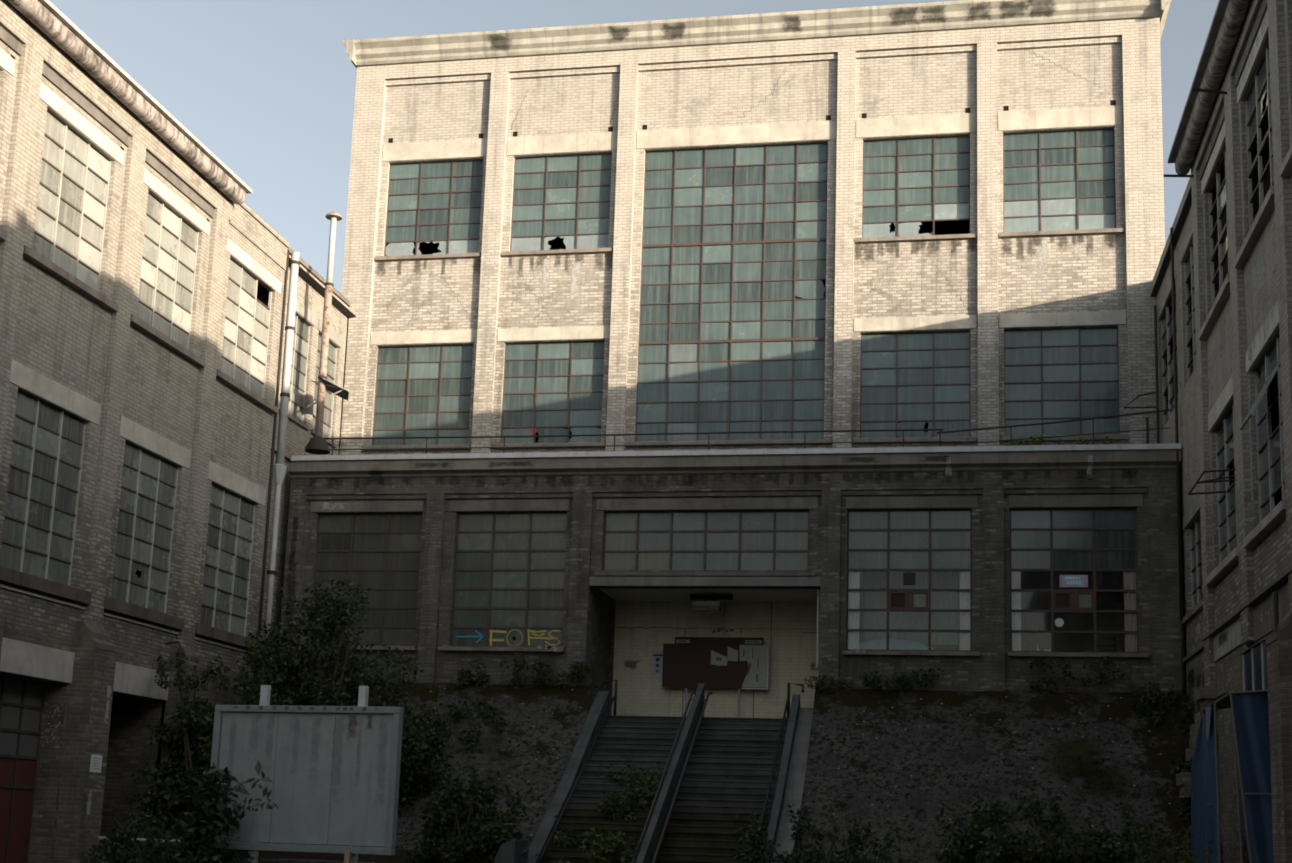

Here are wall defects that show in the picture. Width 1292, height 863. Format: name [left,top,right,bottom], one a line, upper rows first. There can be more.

water stain [890,6,945,25]
water stain [968,0,1054,19]
water stain [610,26,629,40]
water stain [663,24,684,37]
water stain [786,17,800,31]
water stain [489,35,507,49]